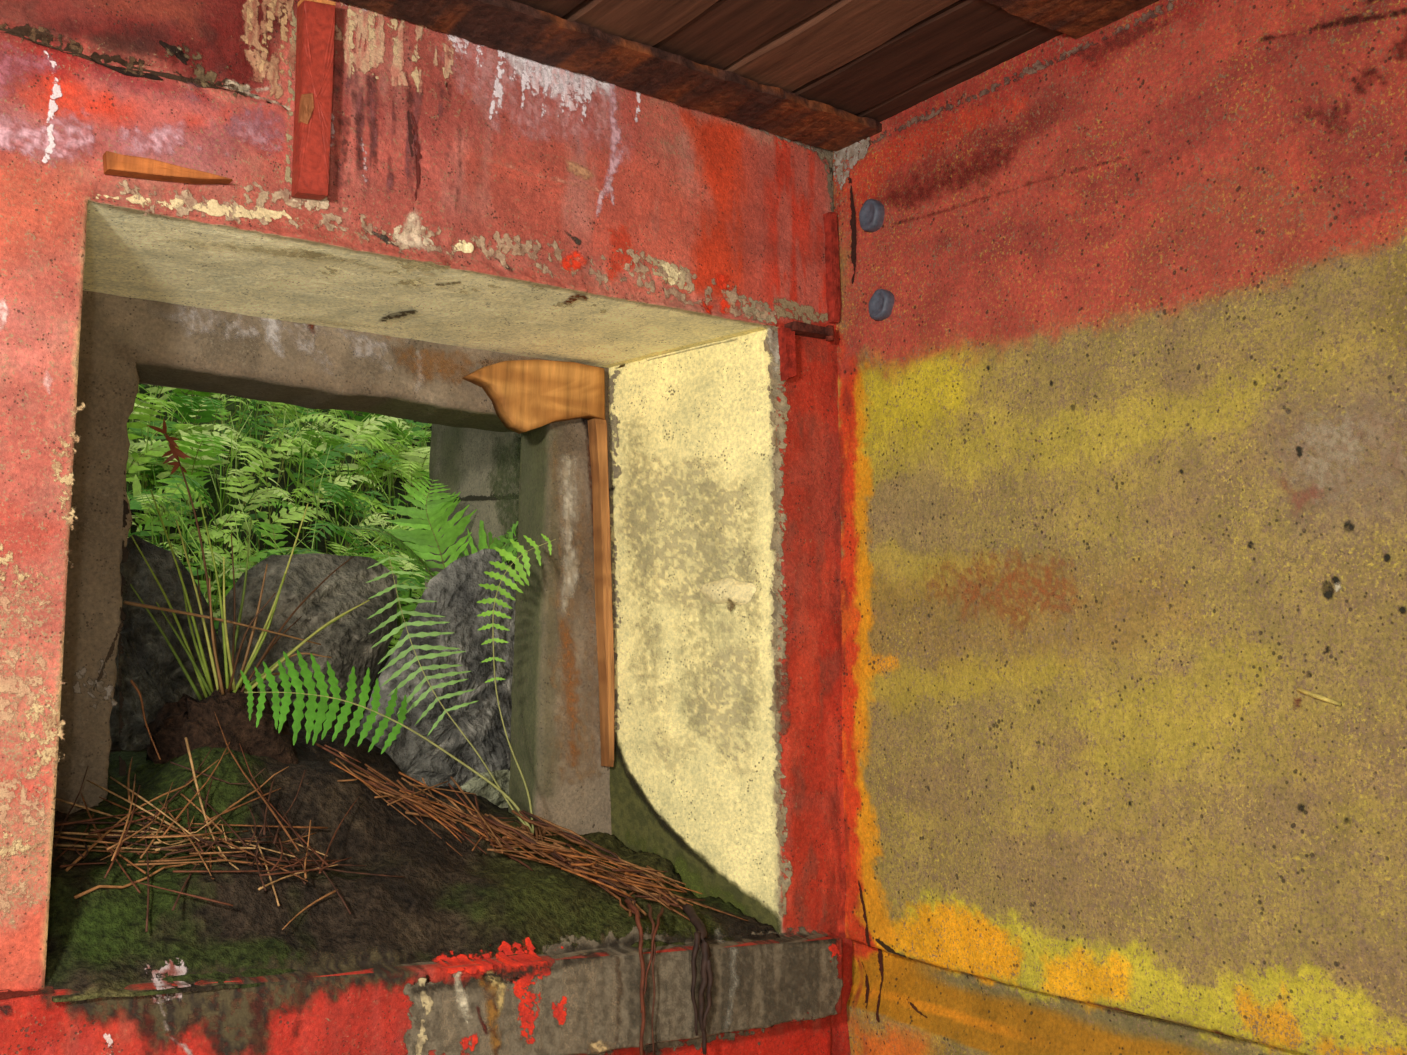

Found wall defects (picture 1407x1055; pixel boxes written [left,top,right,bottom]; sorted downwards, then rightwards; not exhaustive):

crack [0,24,291,111]
water stain [334,66,422,192]
water stain [439,35,626,213]
peeling [51,402,85,558]
peeling [96,0,843,1055]
peeling [0,544,117,923]
crack [0,986,55,1015]